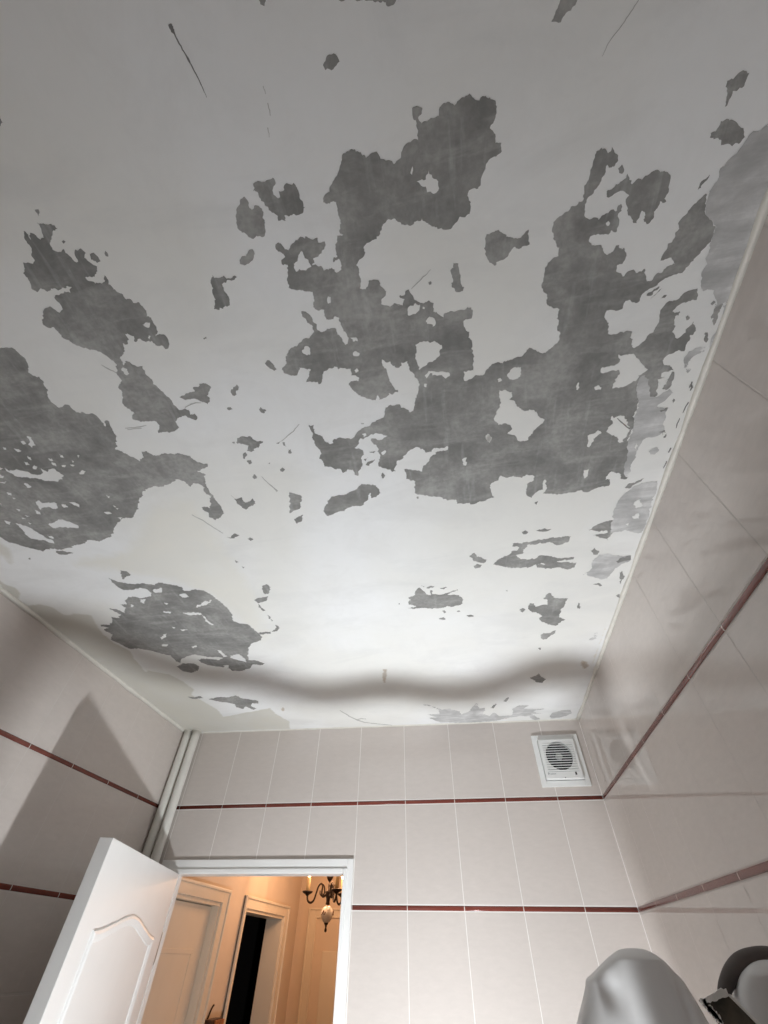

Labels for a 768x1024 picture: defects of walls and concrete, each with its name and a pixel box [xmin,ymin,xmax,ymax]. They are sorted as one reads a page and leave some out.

crack [168,24,207,97]
peeling [710,119,745,146]
peeling [236,178,305,266]
peeling [23,209,211,433]
peeling [211,276,236,310]
peeling [265,94,723,516]
peeling [0,347,224,559]
peeling [470,528,576,570]
peeling [101,570,279,673]
peeling [399,585,473,620]
peeling [520,593,580,650]
peeling [189,696,258,710]